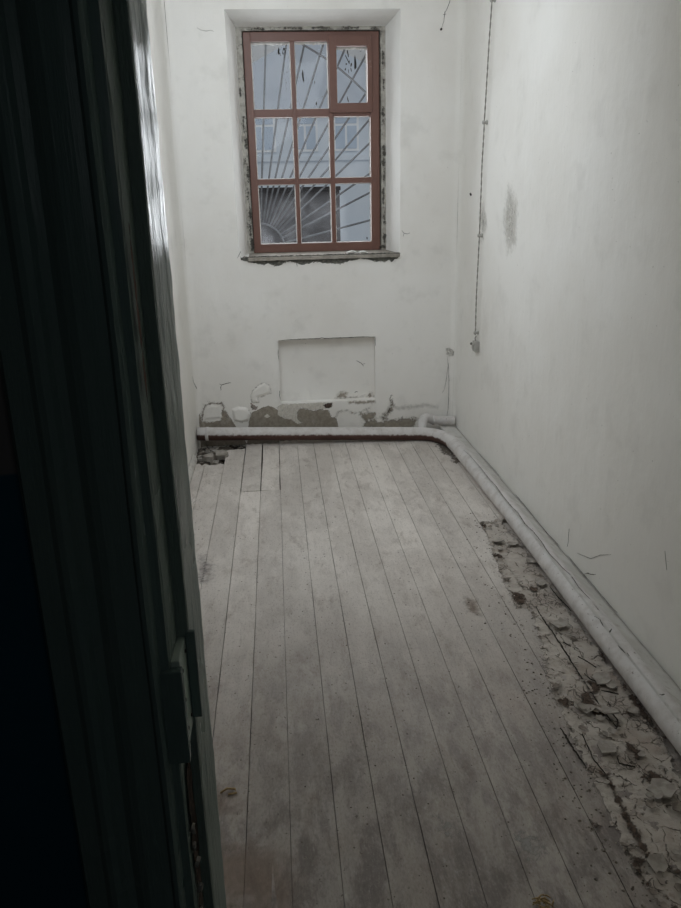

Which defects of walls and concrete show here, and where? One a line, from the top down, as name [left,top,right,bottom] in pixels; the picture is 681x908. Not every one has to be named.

flaking render [199,410,236,427]
flaking render [248,394,338,427]
flaking render [197,440,297,465]